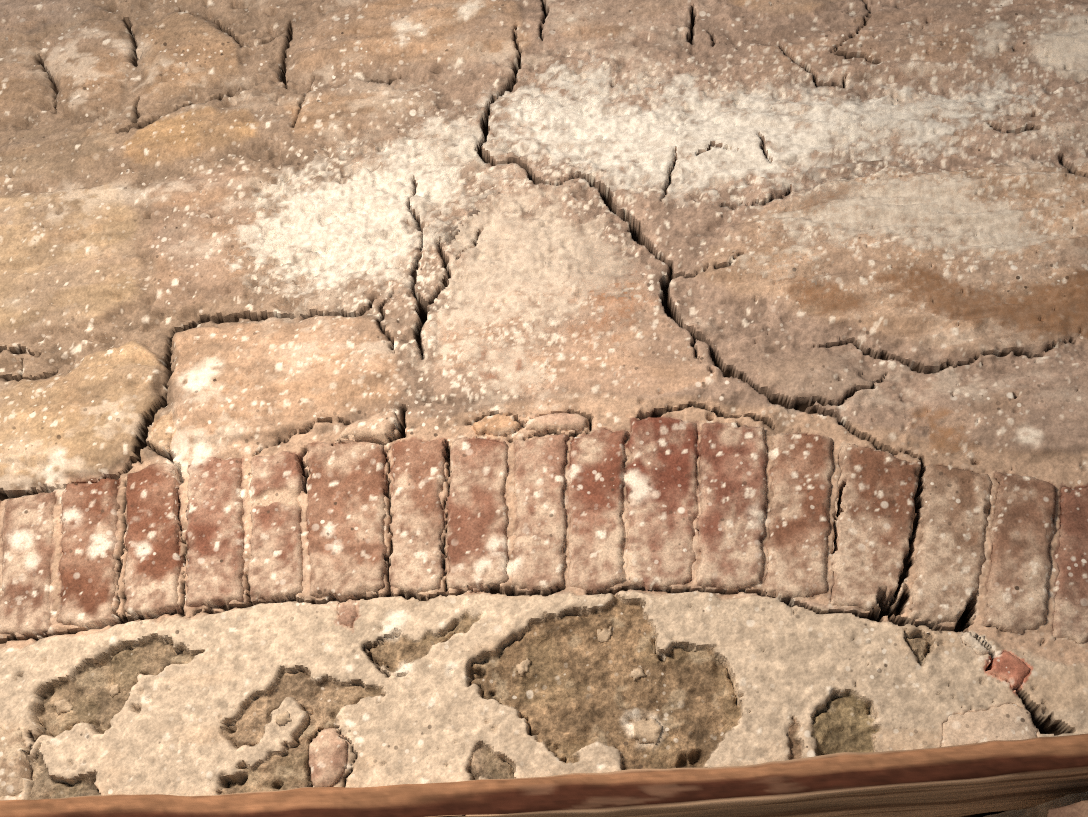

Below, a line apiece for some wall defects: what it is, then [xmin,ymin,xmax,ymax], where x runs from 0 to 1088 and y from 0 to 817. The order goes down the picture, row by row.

efflorescence [976,23,1007,57]
efflorescence [1034,14,1088,81]
water stain [238,62,1052,395]
crack [0,176,566,625]
crack [467,0,1076,671]
water stain [882,269,1088,336]
crack [0,628,90,644]
spalling [29,633,205,800]
spalling [216,665,386,795]
spalling [469,593,744,770]
spalling [787,688,882,760]
crack [1015,687,1076,736]